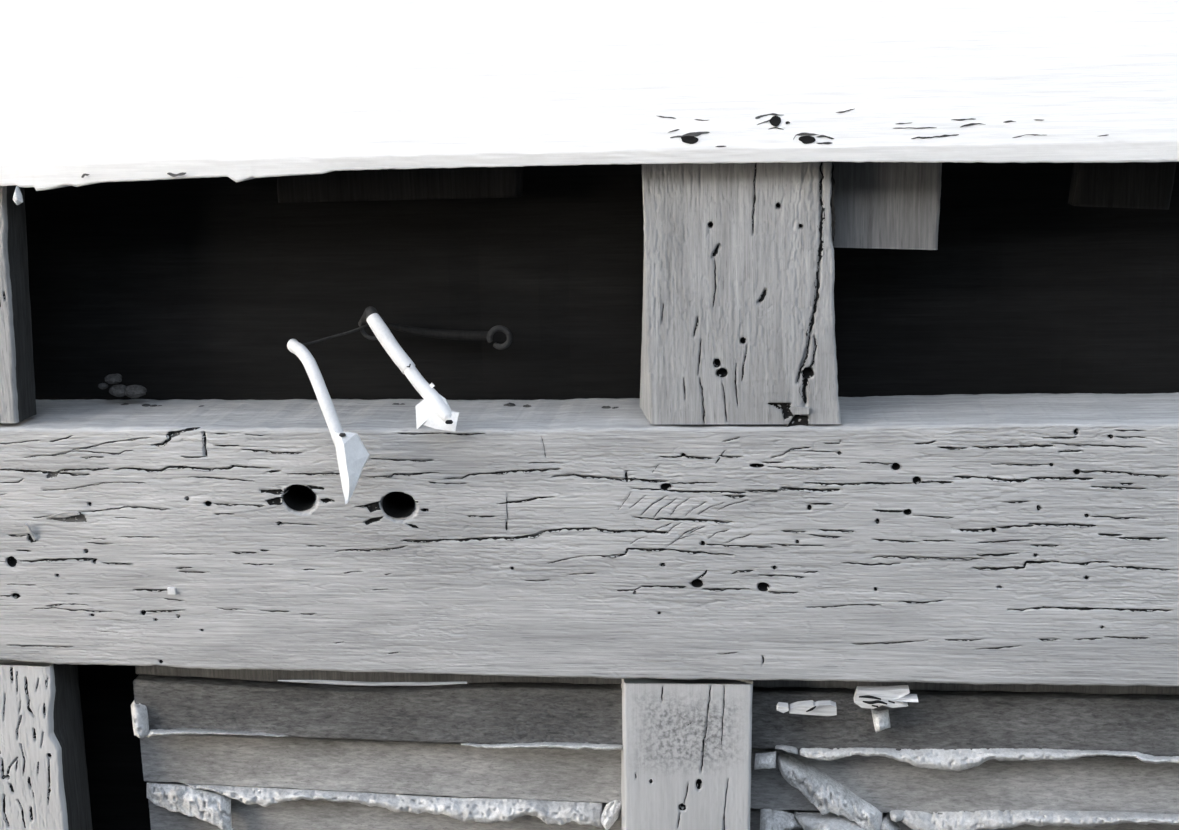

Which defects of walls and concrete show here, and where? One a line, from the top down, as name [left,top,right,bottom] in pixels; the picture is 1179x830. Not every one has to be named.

crack [755,109,854,403]
crack [0,245,1170,633]
crack [858,606,1171,649]
crack [1,645,73,828]
crack [677,687,729,830]